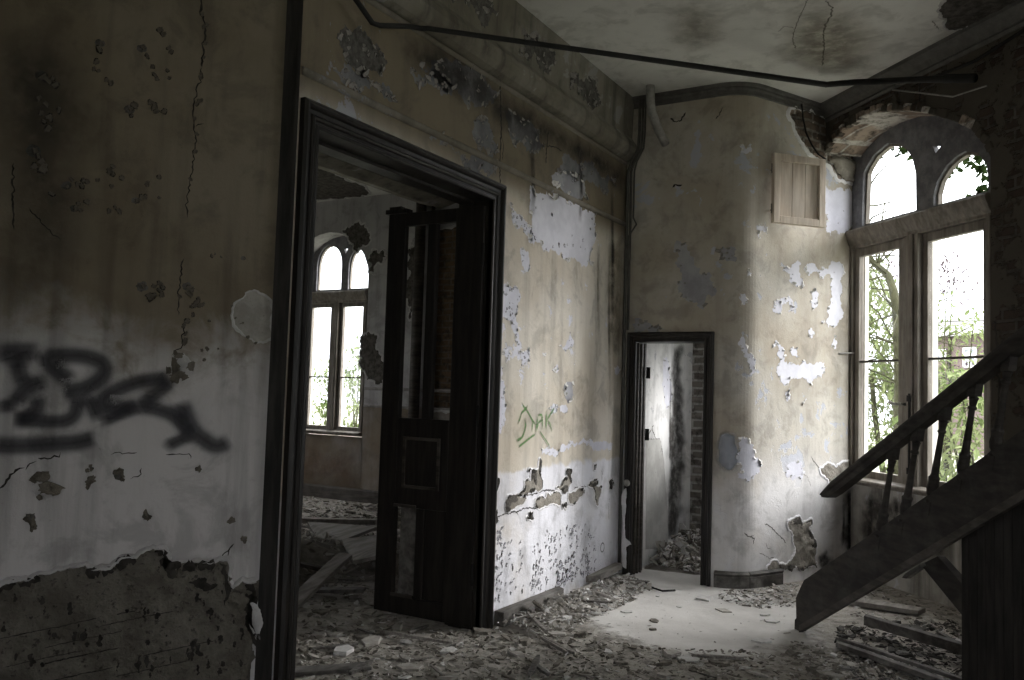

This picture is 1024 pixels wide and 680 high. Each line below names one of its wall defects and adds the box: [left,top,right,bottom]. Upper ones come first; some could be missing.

crack [778,0,834,65]
crack [185,0,209,217]
peeling [509,153,616,272]
crack [172,259,194,355]
peeling [773,260,846,349]
spalling [359,330,384,386]
crack [497,472,603,517]
spalling [494,438,631,603]
leakage [668,348,685,536]
peeling [736,437,762,482]
spalling [765,514,818,572]
spalling [0,544,259,680]